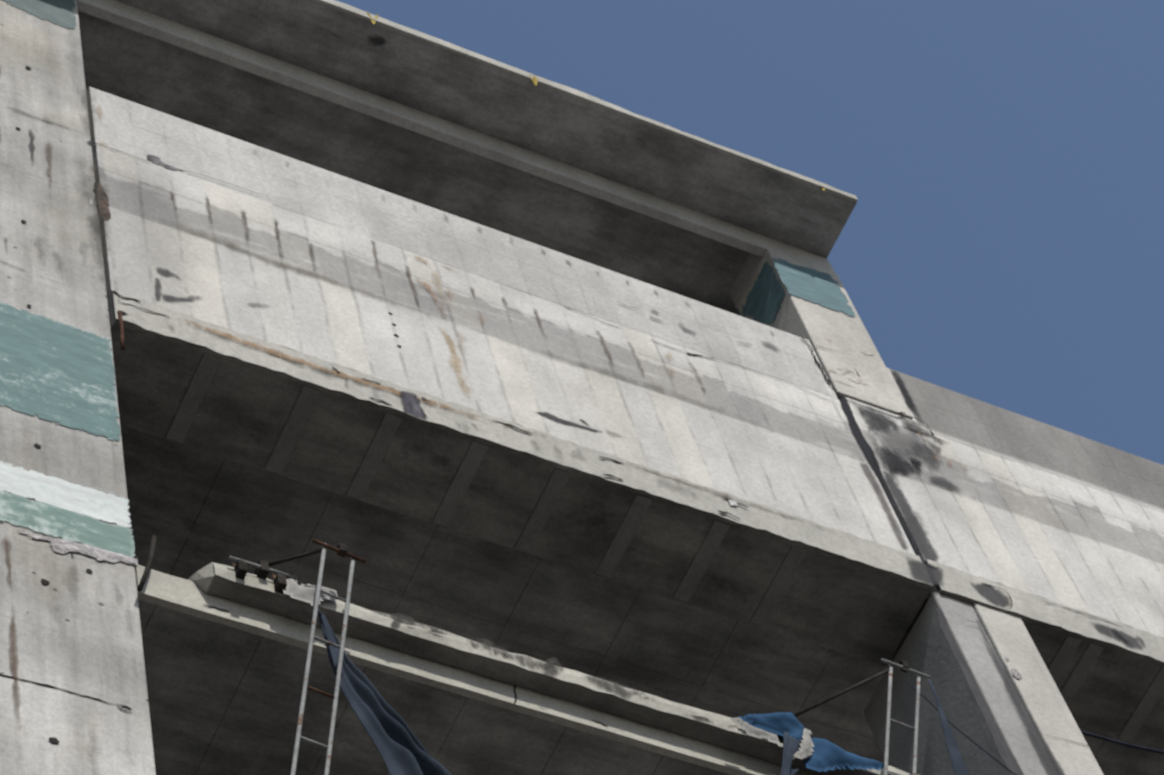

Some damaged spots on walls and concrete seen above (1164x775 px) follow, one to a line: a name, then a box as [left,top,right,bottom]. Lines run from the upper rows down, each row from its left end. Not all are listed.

rust [195,324,402,397]
leakage [839,371,960,584]
crack [0,673,132,713]